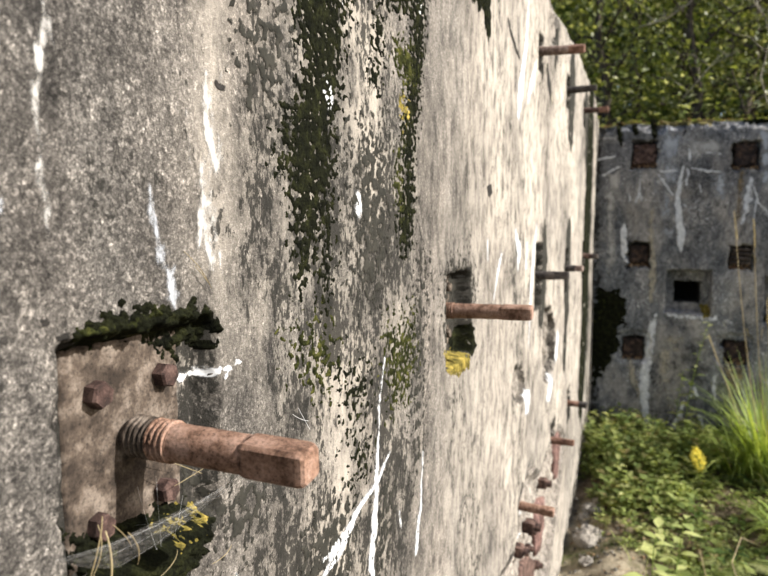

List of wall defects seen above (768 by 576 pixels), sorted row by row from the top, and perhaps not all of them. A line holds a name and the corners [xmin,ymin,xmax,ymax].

damp [648,128,722,302]
damp [759,131,768,187]
spalling [500,423,565,576]